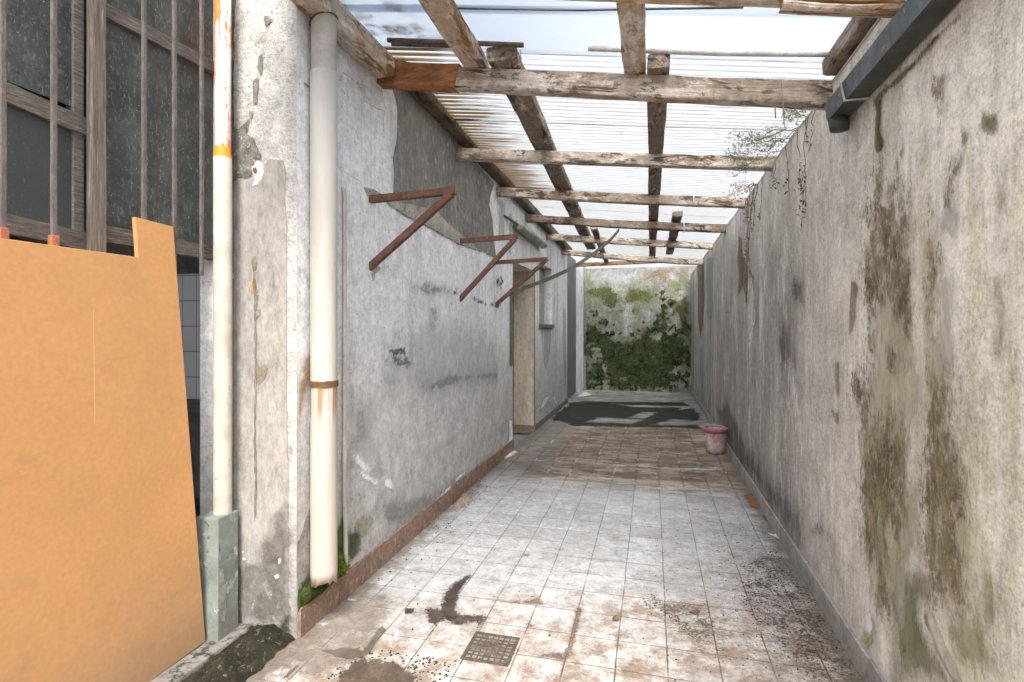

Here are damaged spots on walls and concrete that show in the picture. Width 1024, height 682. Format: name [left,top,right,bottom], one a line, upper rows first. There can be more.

peeling [231,0,263,183]
peeling [364,90,496,257]
corrosion [300,356,310,410]
leakage [387,348,411,368]